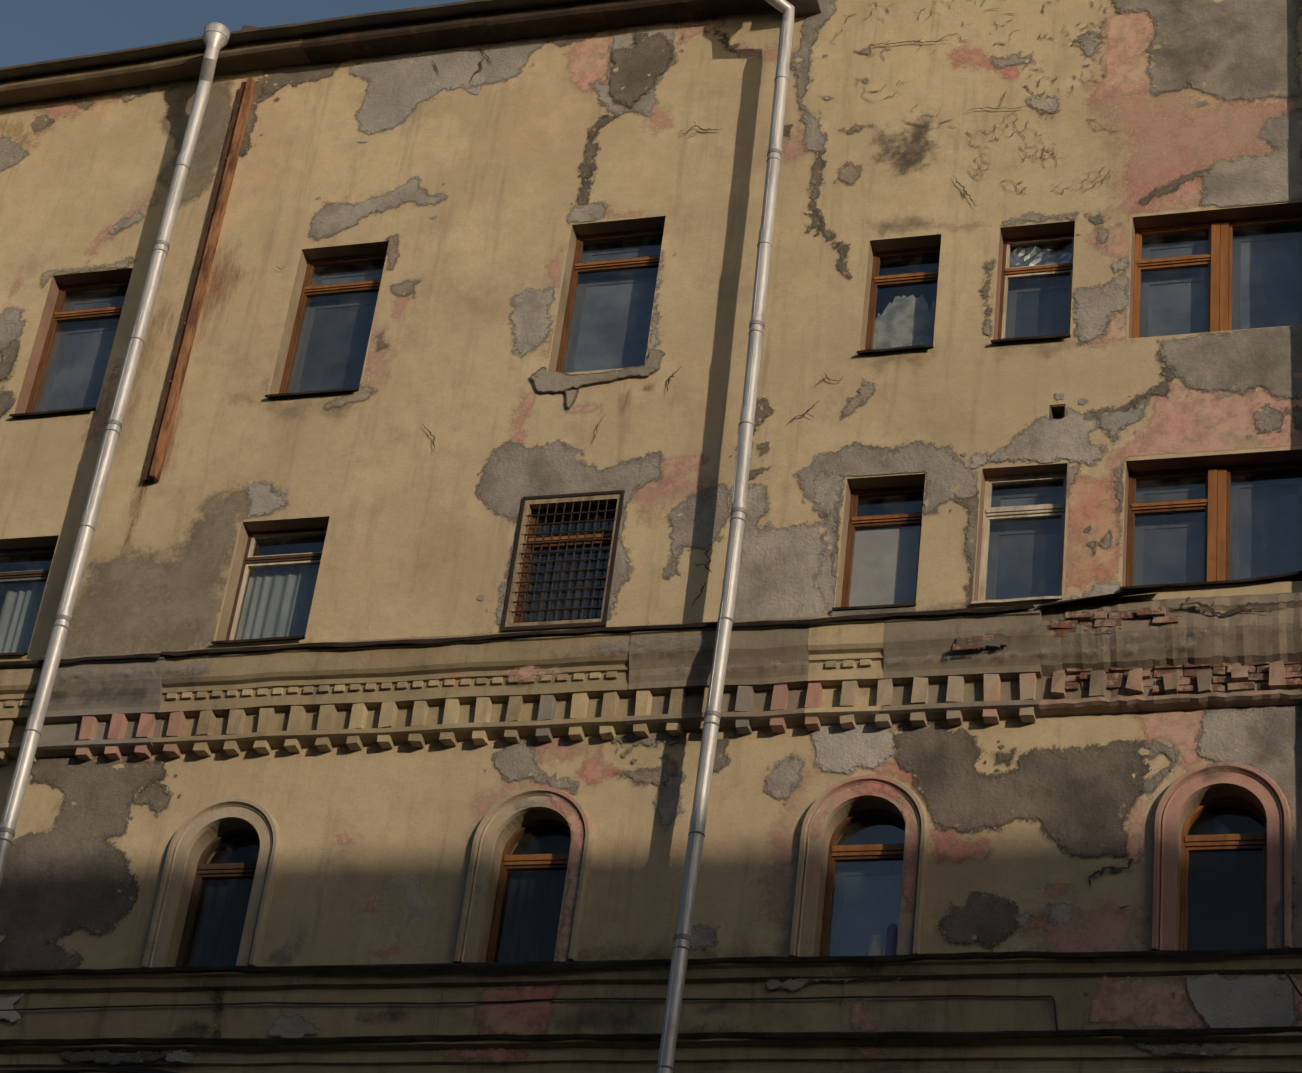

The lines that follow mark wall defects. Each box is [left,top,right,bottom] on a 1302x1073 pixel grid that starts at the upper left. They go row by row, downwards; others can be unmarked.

peeling [39,192,160,289]
peeling [239,0,874,279]
crack [831,0,1120,206]
peeling [1077,0,1302,208]
peeling [0,282,26,416]
peeling [475,250,708,625]
spalling [931,633,1018,659]
peeling [0,753,181,971]
peeling [485,730,731,962]
peeling [763,661,1302,952]
crack [1088,859,1134,887]
peeling [1088,972,1302,1062]